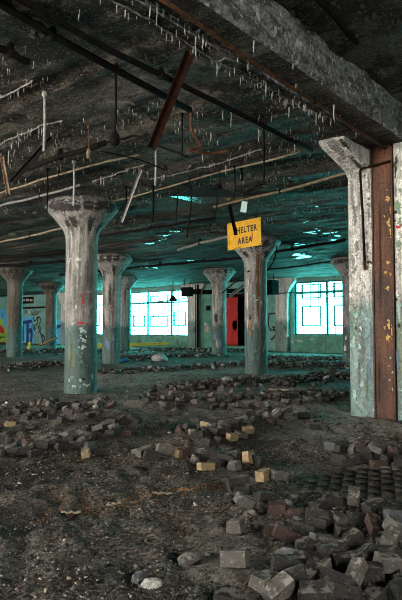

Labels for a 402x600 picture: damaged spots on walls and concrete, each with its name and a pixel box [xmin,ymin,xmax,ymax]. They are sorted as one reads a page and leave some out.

peeling [351,158,372,297]